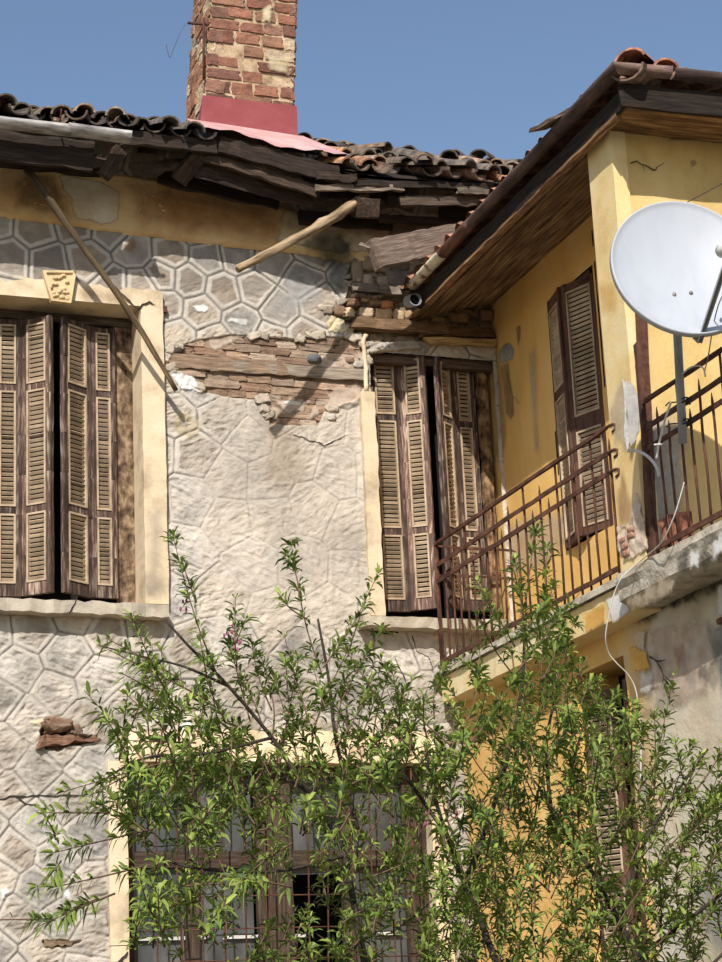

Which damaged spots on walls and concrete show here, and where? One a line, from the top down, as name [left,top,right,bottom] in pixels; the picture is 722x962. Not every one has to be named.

peeling [60,175,119,224]
crack [115,286,155,310]
flaking render [164,211,514,426]
flaking render [622,378,640,450]
flaking render [617,493,648,559]
crack [0,794,92,806]